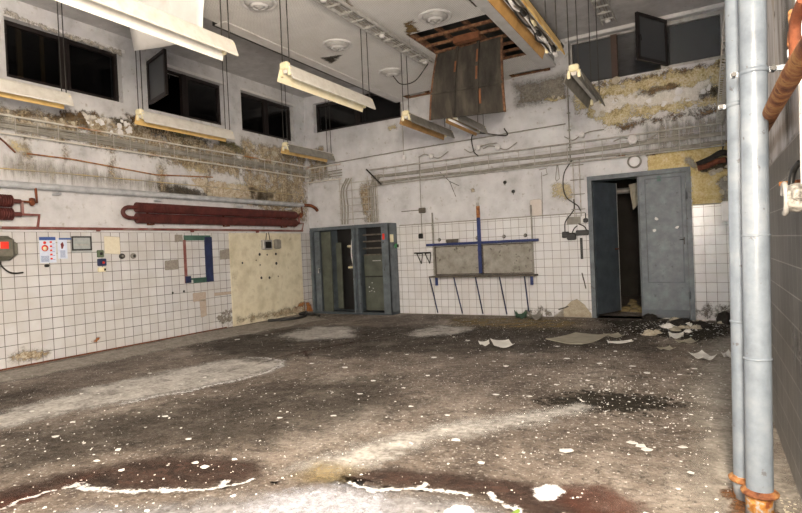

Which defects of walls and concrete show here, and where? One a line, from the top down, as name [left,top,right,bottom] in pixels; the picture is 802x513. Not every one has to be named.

flaking render [4,9,122,56]
rust [787,0,802,59]
peeling [544,59,725,126]
peeling [0,108,136,137]
peeling [685,156,728,201]
rust [720,489,746,513]